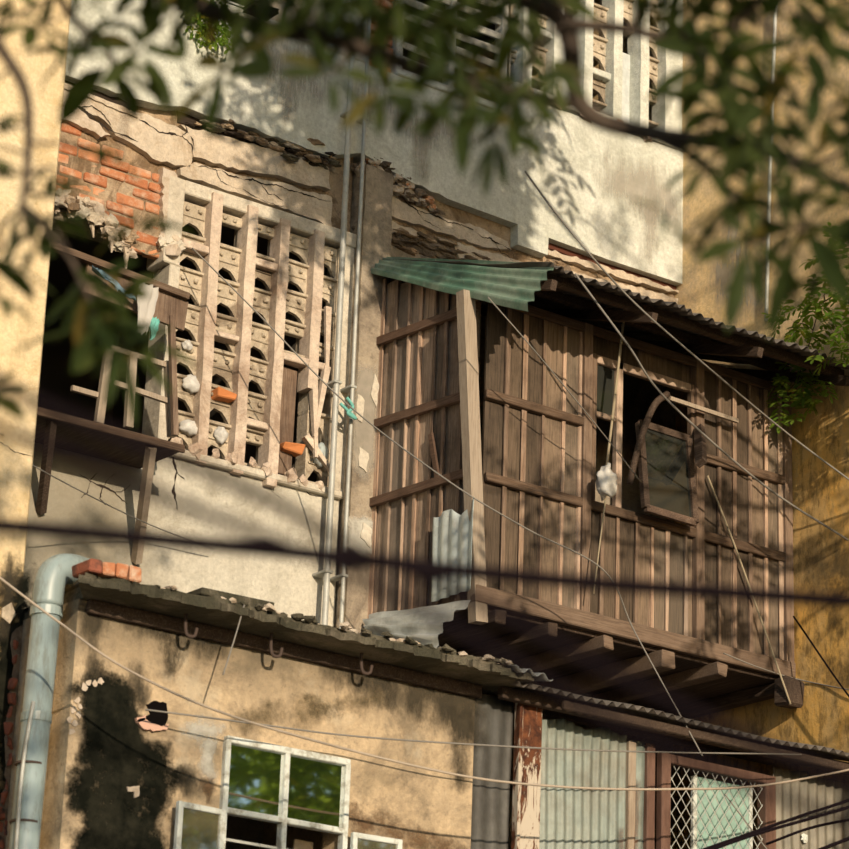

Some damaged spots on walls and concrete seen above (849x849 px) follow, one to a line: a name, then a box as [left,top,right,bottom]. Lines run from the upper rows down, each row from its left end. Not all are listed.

flaking render [54,110,186,260]
crack [81,105,325,206]
crack [81,474,127,505]
leakage [82,609,104,646]
leakage [133,624,227,673]
spalling [0,602,23,849]
leakage [65,656,222,849]
spalling [135,701,169,732]